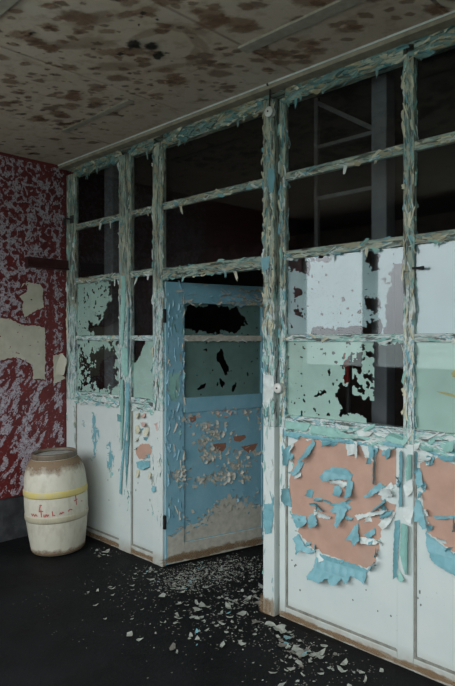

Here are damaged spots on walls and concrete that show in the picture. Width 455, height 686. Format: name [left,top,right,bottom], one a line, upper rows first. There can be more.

damp [189,2,267,33]
damp [330,13,373,41]
damp [424,4,450,15]
damp [0,0,189,154]
damp [184,43,248,102]
damp [250,38,330,74]
peeling [0,25,455,565]